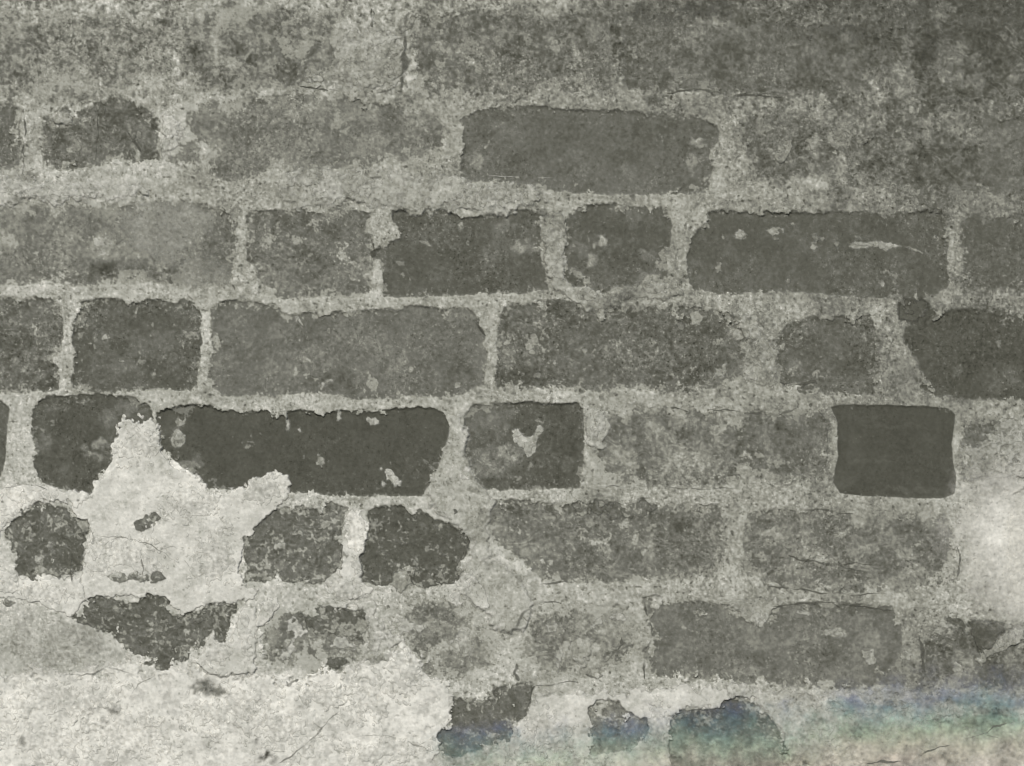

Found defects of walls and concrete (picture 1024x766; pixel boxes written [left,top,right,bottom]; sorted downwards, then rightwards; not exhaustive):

peeling [0,413,1024,766]